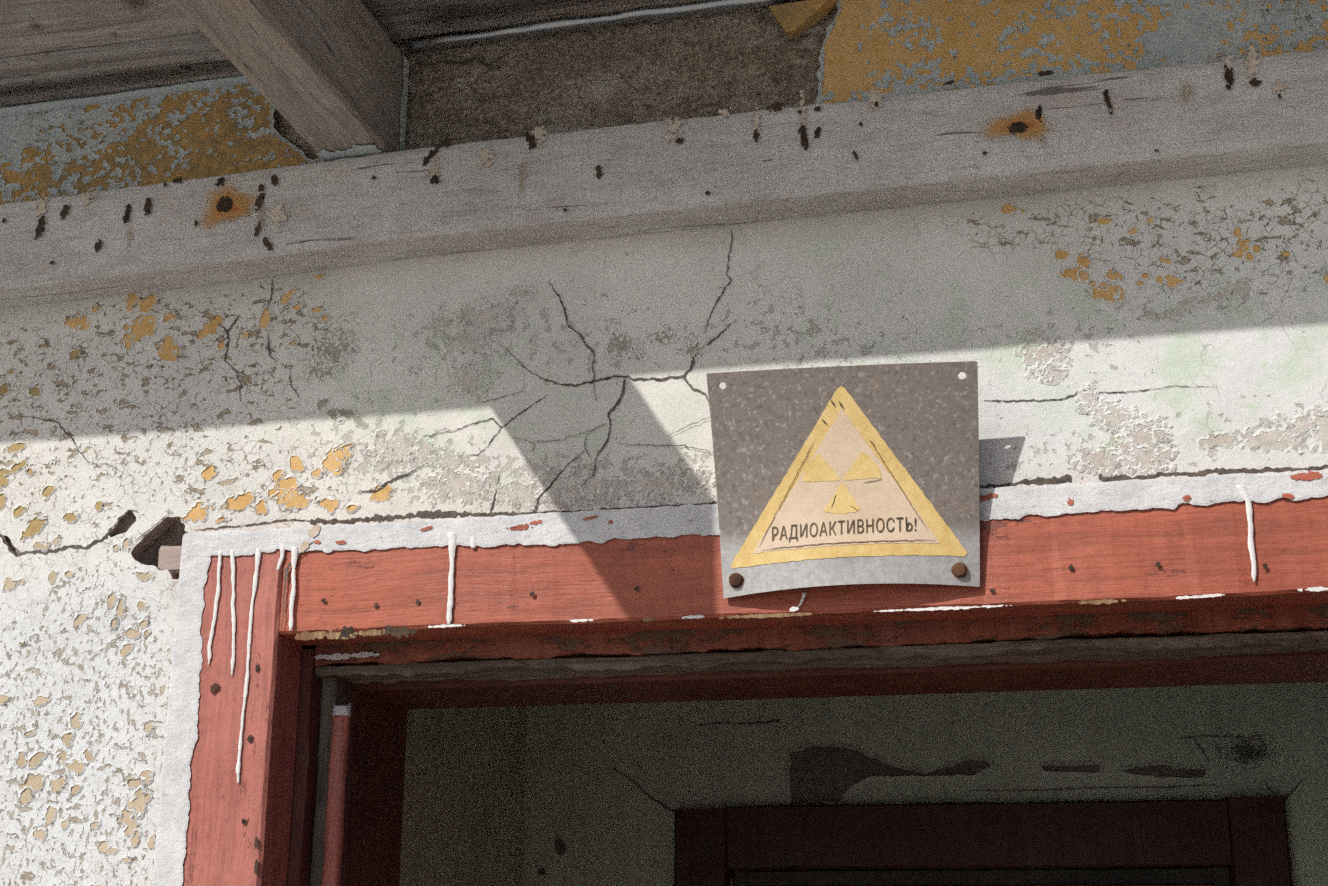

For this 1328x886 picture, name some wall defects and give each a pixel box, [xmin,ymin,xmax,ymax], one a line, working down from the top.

peeling [0,83,323,251]
corrosion [205,187,255,226]
spalling [393,0,1328,184]
corrosion [986,110,1043,138]
peeling [1052,225,1293,323]
crack [0,230,736,556]
peeling [0,440,79,556]
peeling [103,591,151,658]
peeling [295,629,385,660]
peeling [16,710,98,843]
peeling [88,768,156,864]
spalling [785,742,996,805]